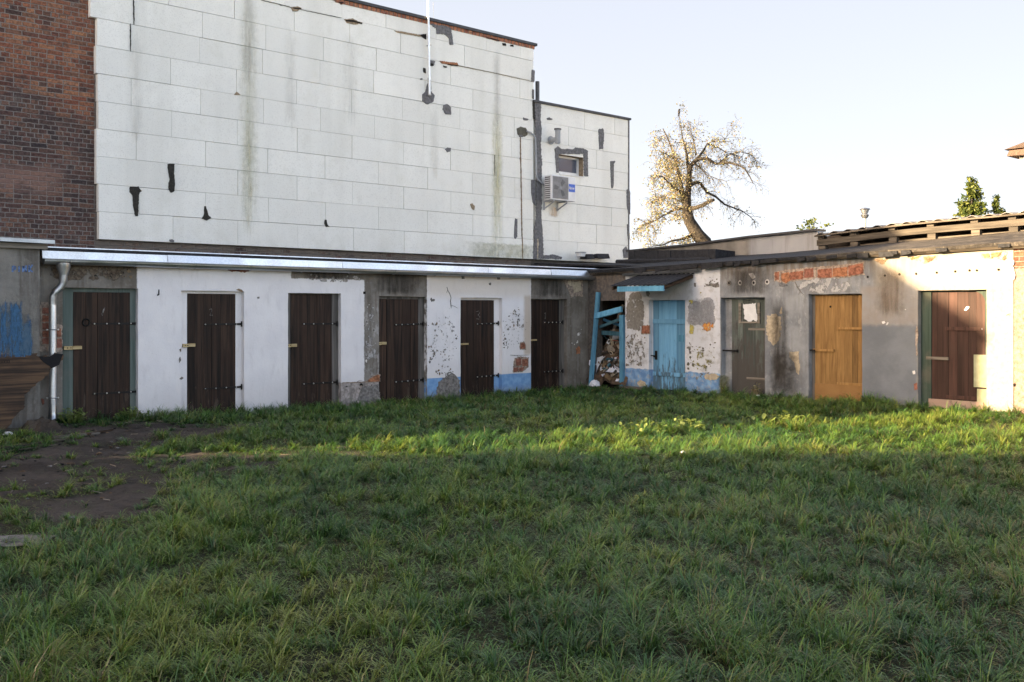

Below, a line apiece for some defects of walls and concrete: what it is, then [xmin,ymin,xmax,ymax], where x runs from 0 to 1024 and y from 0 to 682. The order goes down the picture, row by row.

flaking render [694,257,887,294]
peeling [0,301,63,357]
spalling [428,317,460,398]
flaking render [503,309,529,373]
peeling [625,291,651,366]
peeling [766,307,782,346]